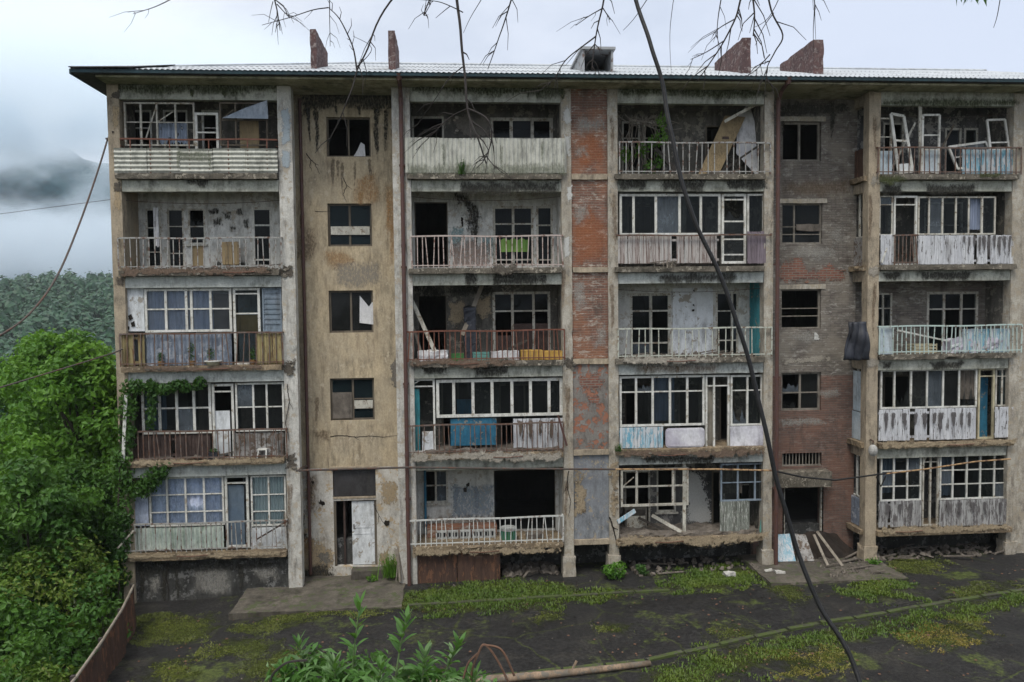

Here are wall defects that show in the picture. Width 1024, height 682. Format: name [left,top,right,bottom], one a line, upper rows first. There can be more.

leakage [301,95,392,186]
spalling [780,257,847,284]
spalling [409,420,561,464]
peeling [381,481,398,505]